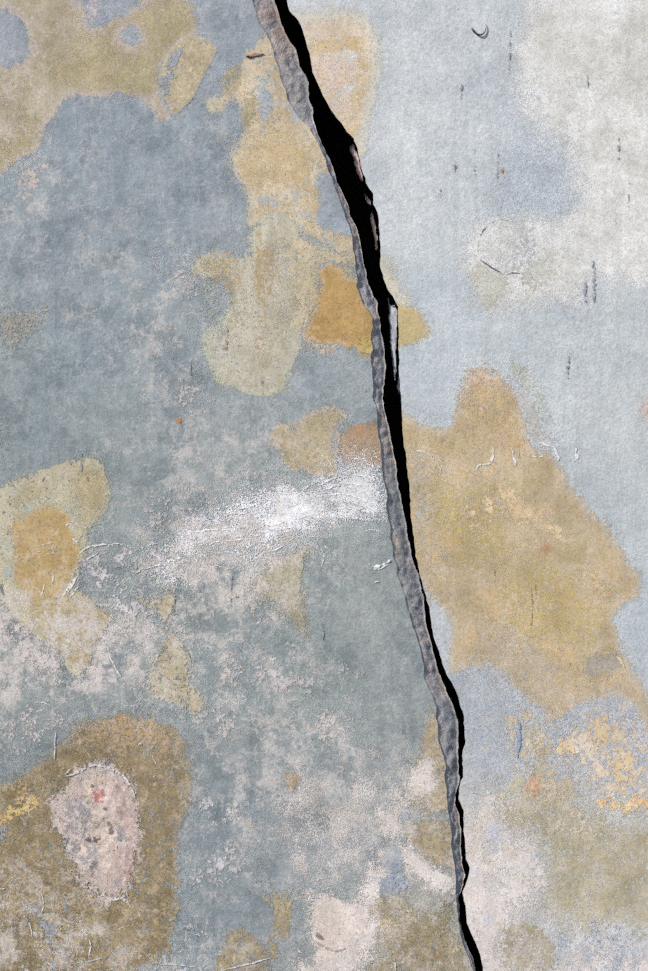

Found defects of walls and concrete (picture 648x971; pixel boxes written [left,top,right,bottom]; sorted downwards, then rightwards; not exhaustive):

water stain [197,31,357,331]
water stain [0,356,648,971]
crack [252,0,483,971]
water stain [380,245,434,354]